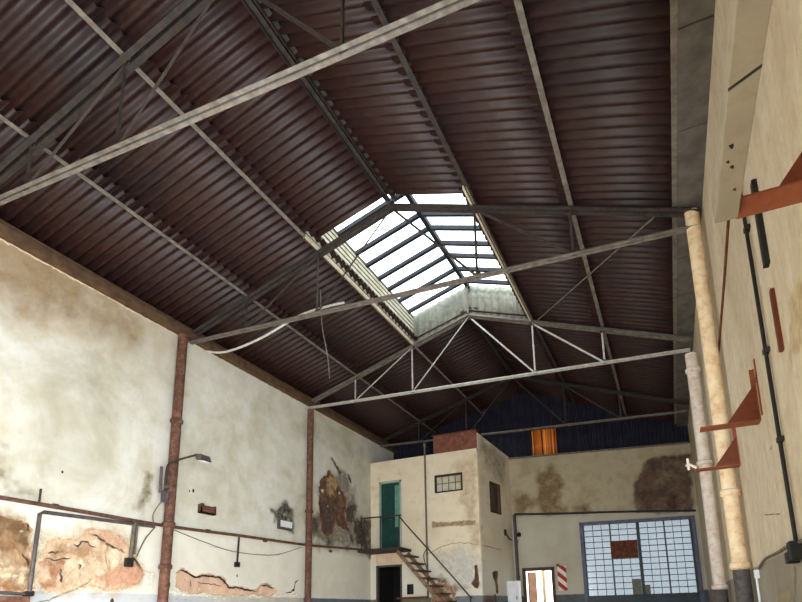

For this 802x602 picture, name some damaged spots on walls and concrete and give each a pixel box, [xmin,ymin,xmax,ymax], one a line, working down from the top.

flaking render [318,470,348,537]
flaking render [0,514,144,602]
flaking render [169,568,277,598]